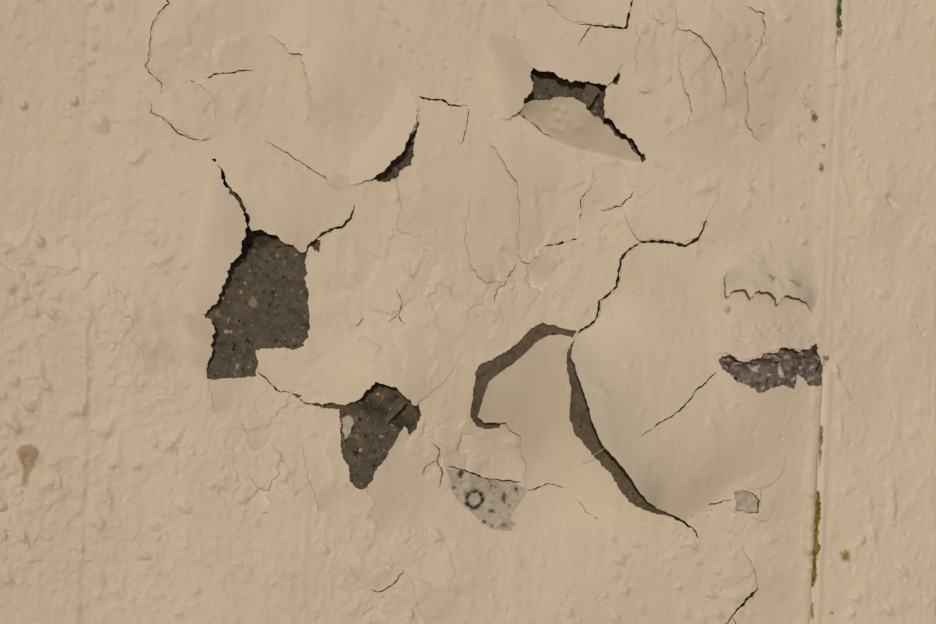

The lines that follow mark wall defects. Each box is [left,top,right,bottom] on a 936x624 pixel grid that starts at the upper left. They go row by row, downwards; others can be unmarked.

peeling [144,0,822,624]
crack [726,587,758,624]